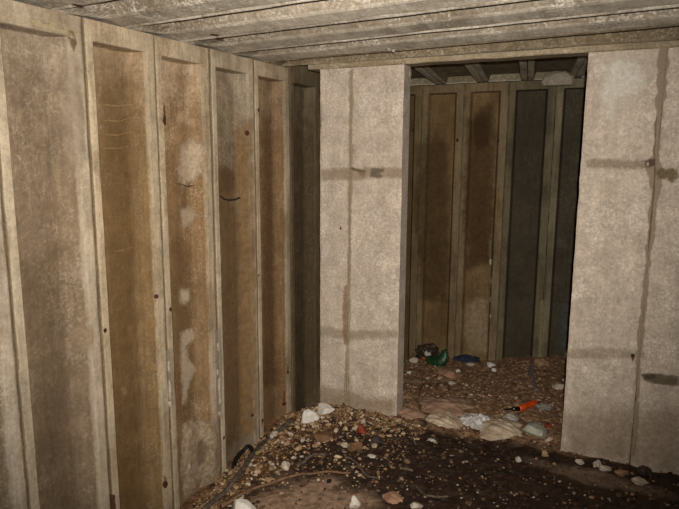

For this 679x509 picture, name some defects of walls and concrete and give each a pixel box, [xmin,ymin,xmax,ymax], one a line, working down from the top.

leakage [179,141,206,185]
leakage [464,112,492,265]
crack [630,47,677,455]
leakage [181,329,195,403]
leakage [642,373,678,386]